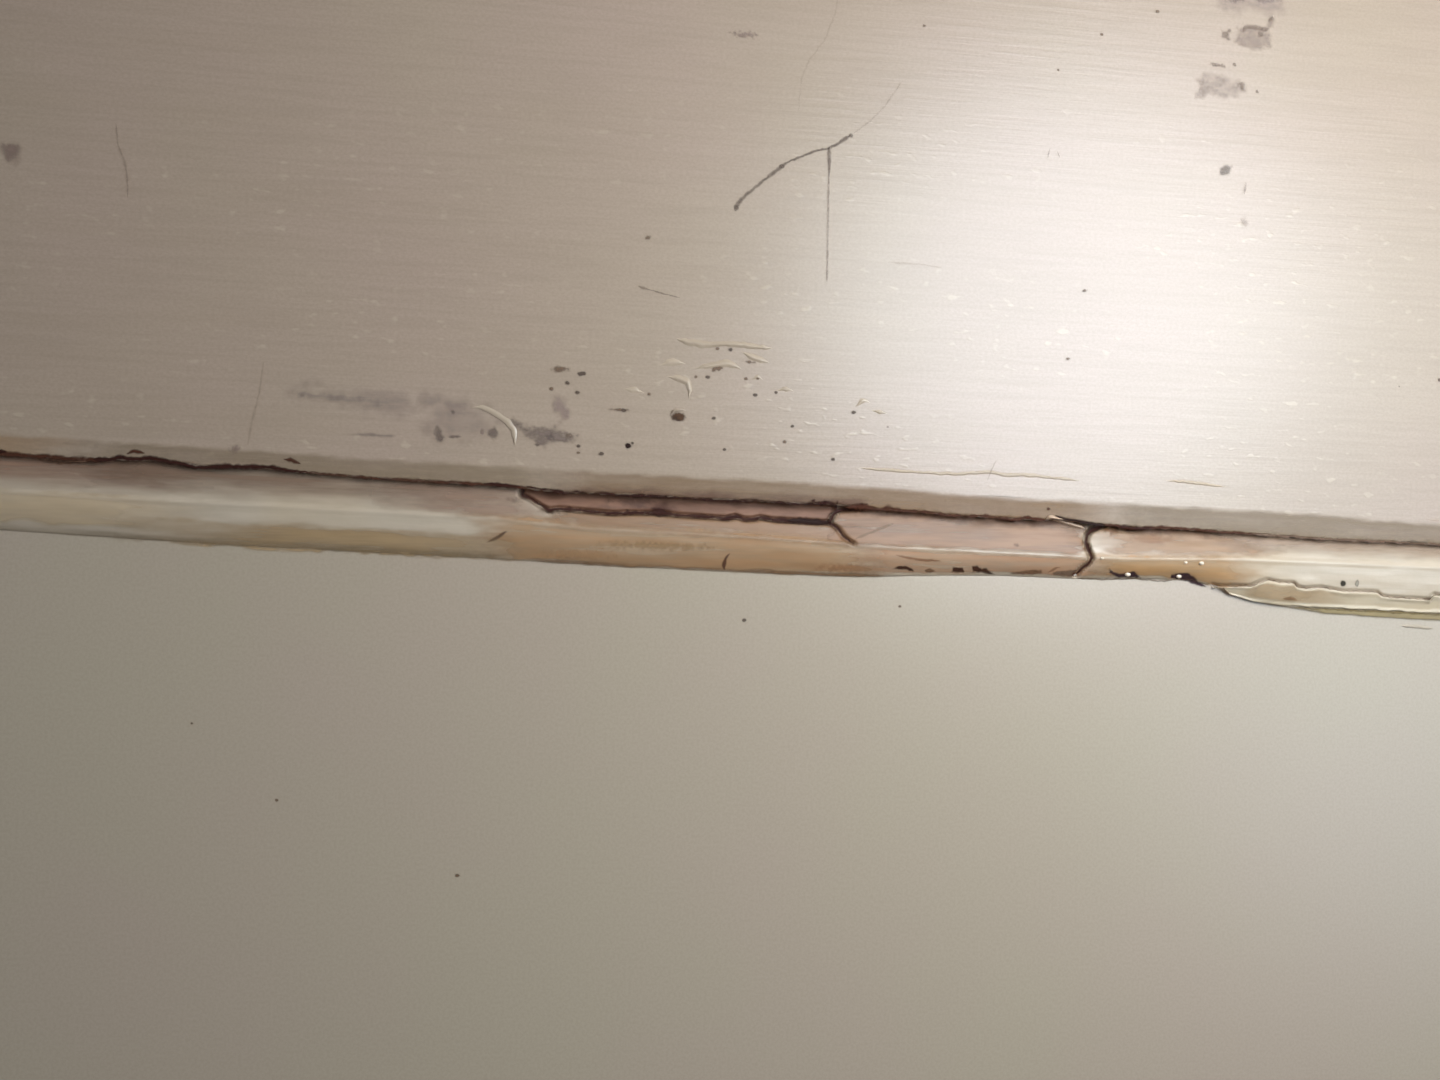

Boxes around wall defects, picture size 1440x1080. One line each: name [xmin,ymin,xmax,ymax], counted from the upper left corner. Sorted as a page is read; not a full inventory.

crack [0,450,528,489]
spalling [521,486,836,525]
crack [812,499,1440,582]
spalling [952,566,993,574]